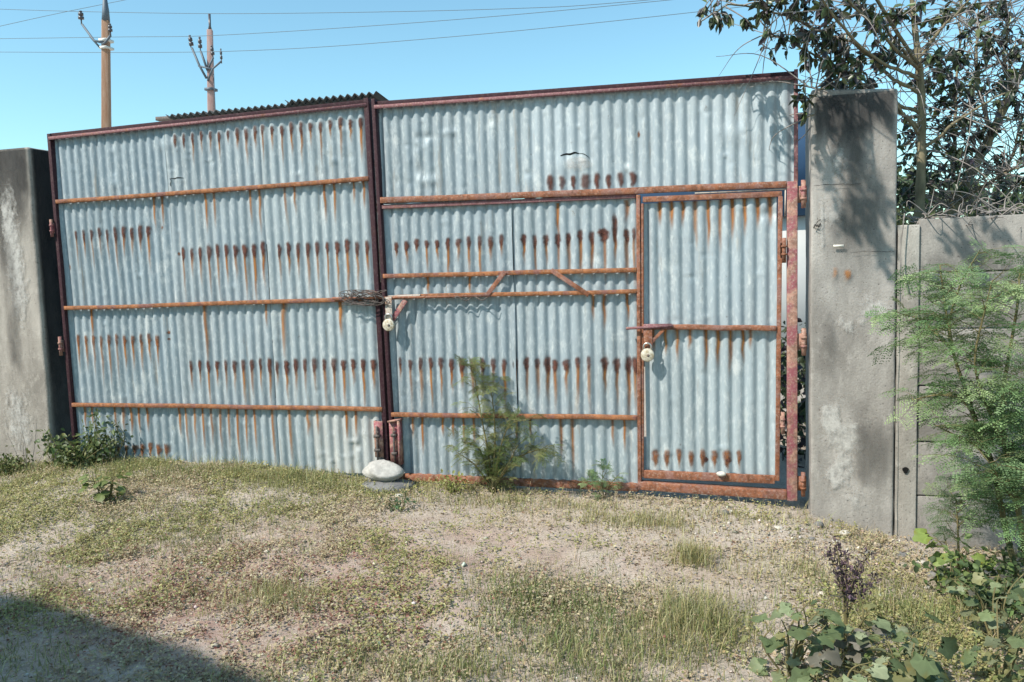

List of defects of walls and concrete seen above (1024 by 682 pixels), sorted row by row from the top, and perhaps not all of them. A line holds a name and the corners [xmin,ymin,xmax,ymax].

rust [173,118,363,152]
rust [547,172,636,191]
rust [75,197,163,254]
rust [520,200,635,266]
rust [658,197,772,236]
rust [178,240,369,286]
rust [394,235,503,288]
rust [77,310,170,367]
rust [704,330,752,358]
rust [189,359,377,395]
rust [399,357,637,398]
rust [653,449,741,466]